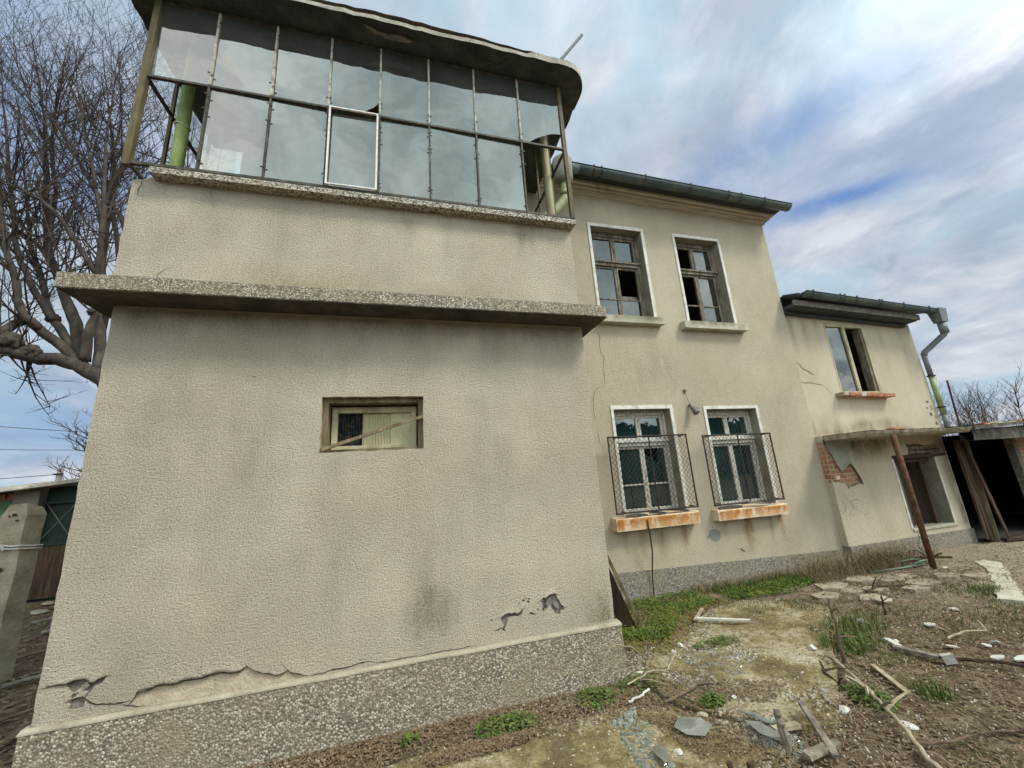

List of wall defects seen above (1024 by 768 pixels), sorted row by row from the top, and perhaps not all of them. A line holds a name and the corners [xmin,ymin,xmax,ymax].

spalling [816,440,864,487]
rust [618,514,700,536]
rust [720,505,787,536]
spalling [491,594,567,631]
crack [310,645,474,676]
peeling [42,664,310,709]